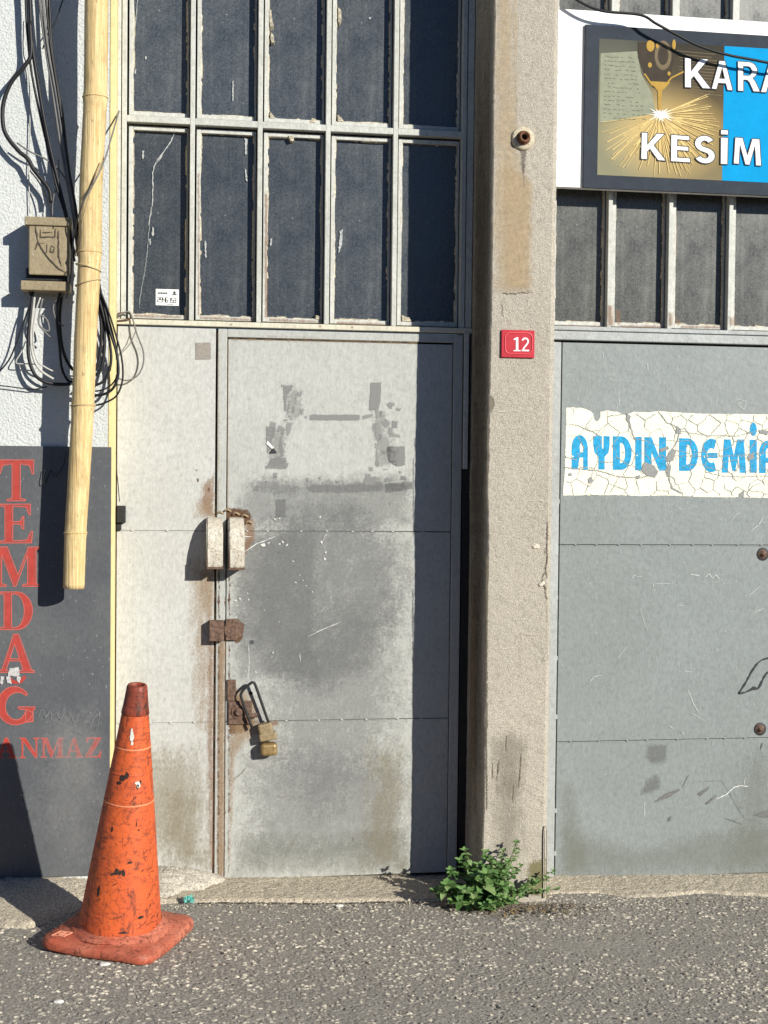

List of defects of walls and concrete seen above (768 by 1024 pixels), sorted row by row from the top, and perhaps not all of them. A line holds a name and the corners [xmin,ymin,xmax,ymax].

peeling [254,382,413,520]
corrosion [226,507,252,546]
corrosion [206,553,255,874]